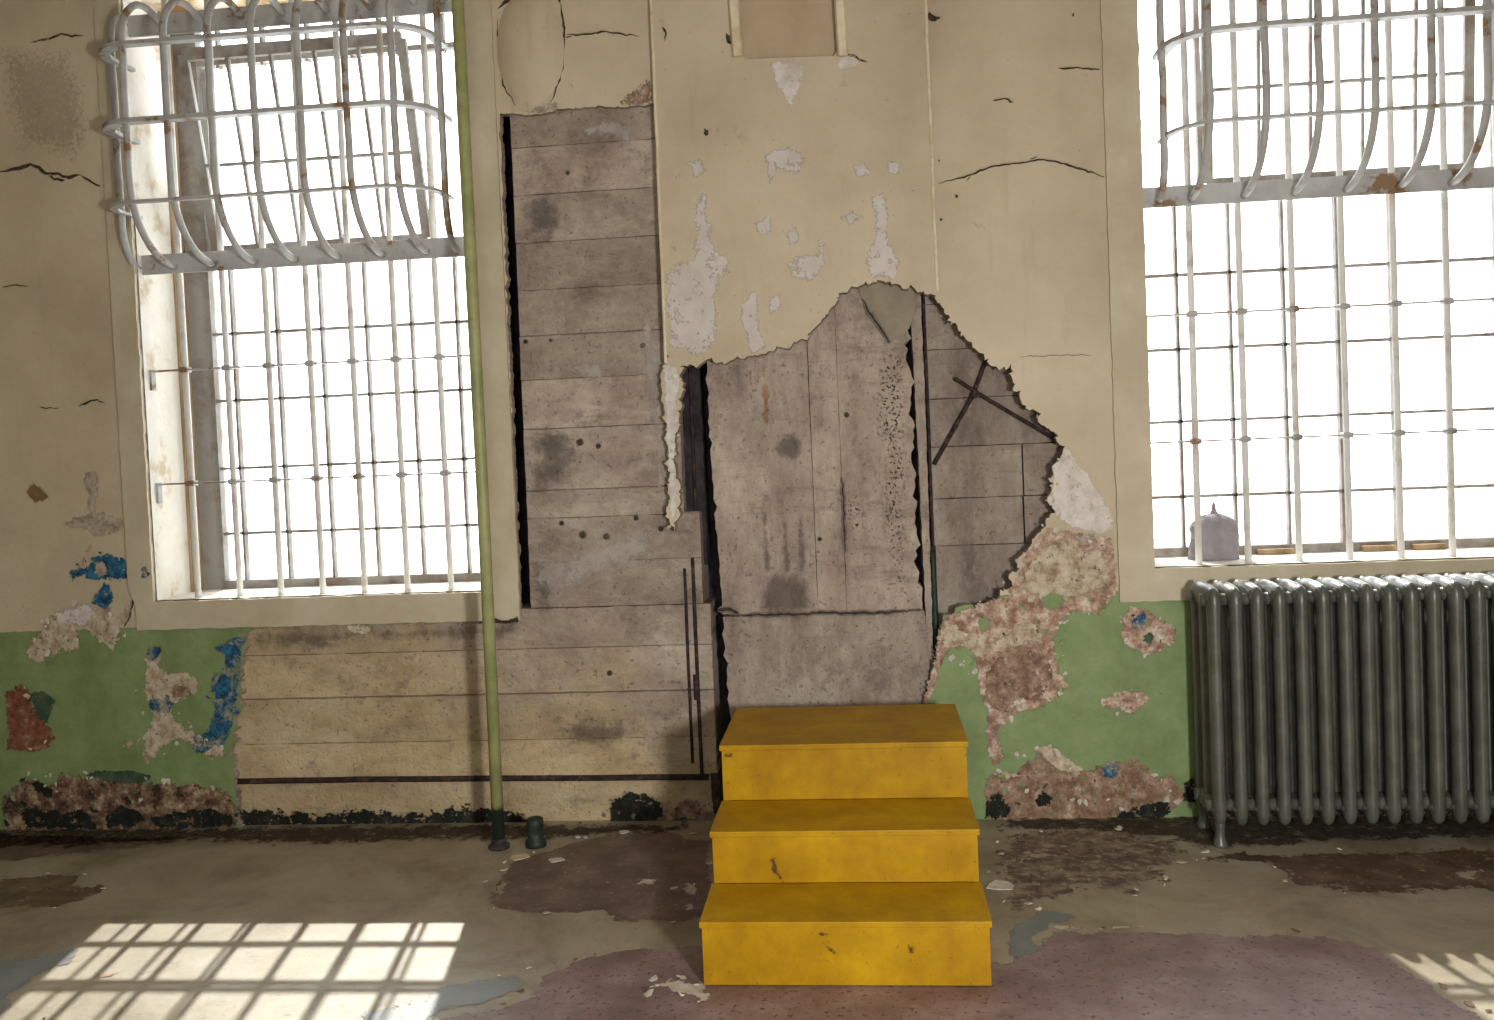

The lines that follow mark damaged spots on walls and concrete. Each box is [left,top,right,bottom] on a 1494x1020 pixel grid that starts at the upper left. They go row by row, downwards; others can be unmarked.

crack [495,0,668,106]
peeling [770,59,804,106]
peeling [837,52,867,71]
crack [0,162,101,187]
crack [938,155,1104,184]
peeling [25,471,150,667]
spalling [361,80,1494,1020]
spalling [0,621,493,861]